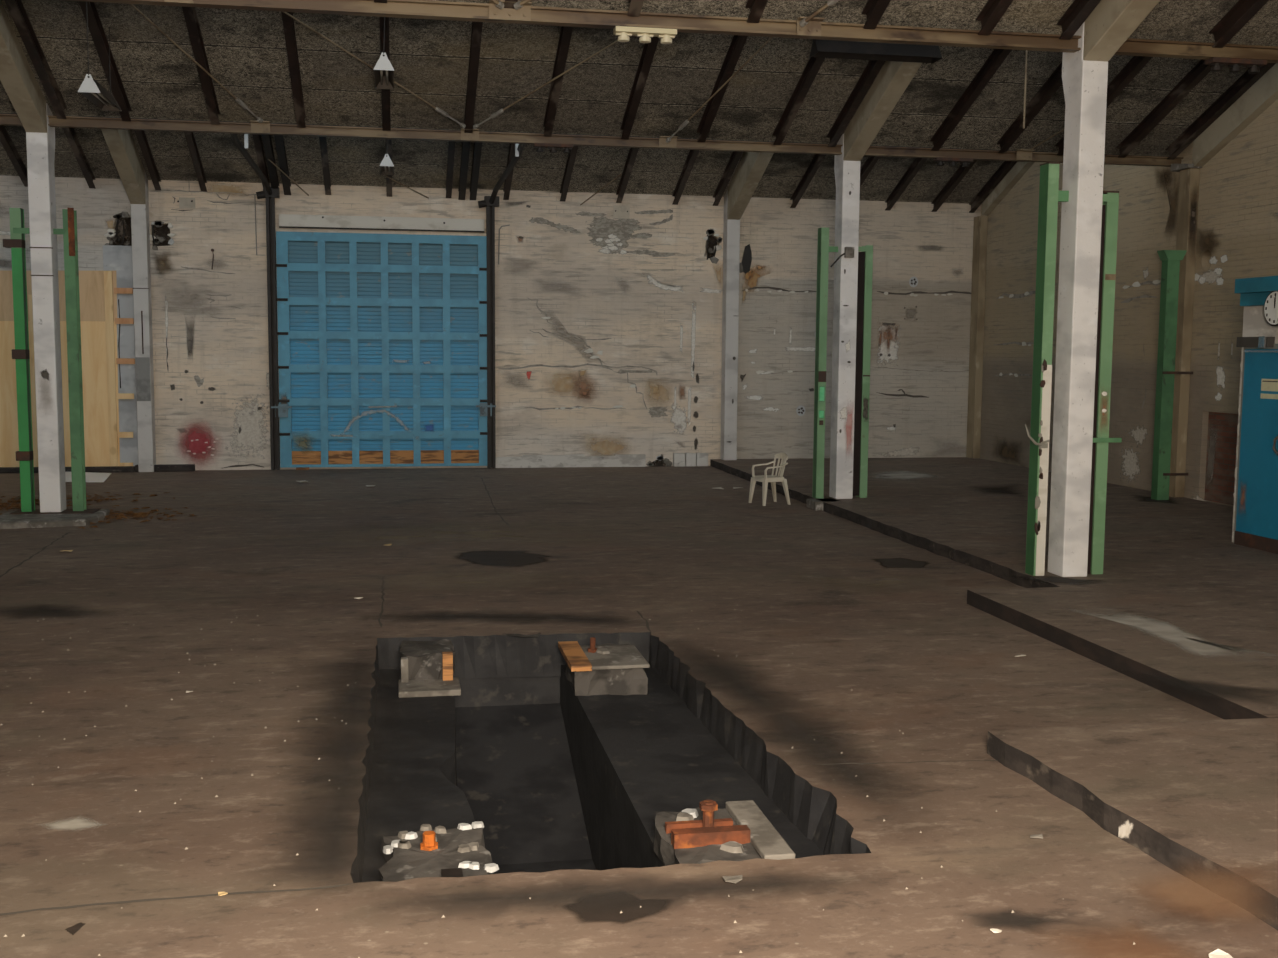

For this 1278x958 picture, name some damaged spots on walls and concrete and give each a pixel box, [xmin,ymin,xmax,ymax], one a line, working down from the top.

peeling [529,209,675,257]